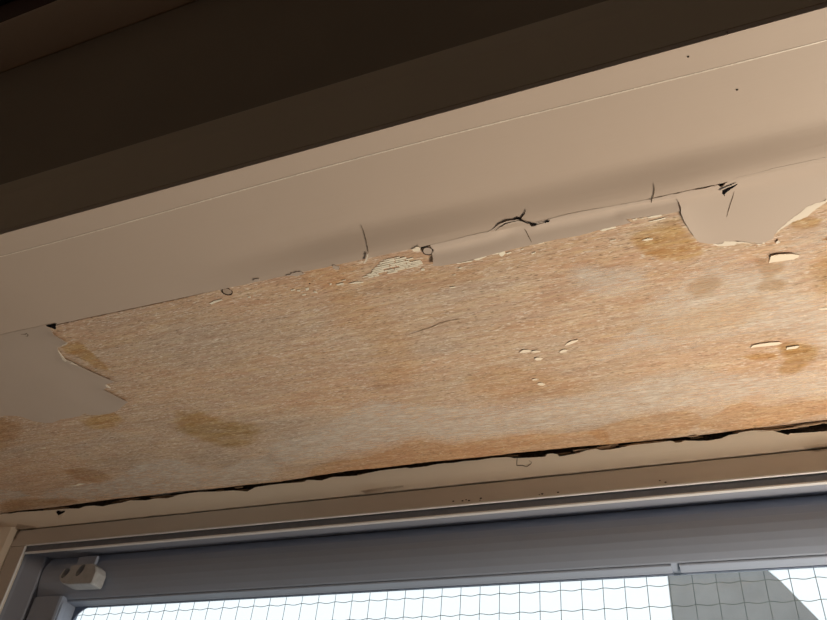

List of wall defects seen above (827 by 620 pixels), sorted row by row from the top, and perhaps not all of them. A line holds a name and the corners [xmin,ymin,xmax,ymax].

crack [495,210,550,231]
peeling [330,157,827,285]
peeling [751,342,800,350]
crack [9,421,827,526]
water stain [56,373,827,499]